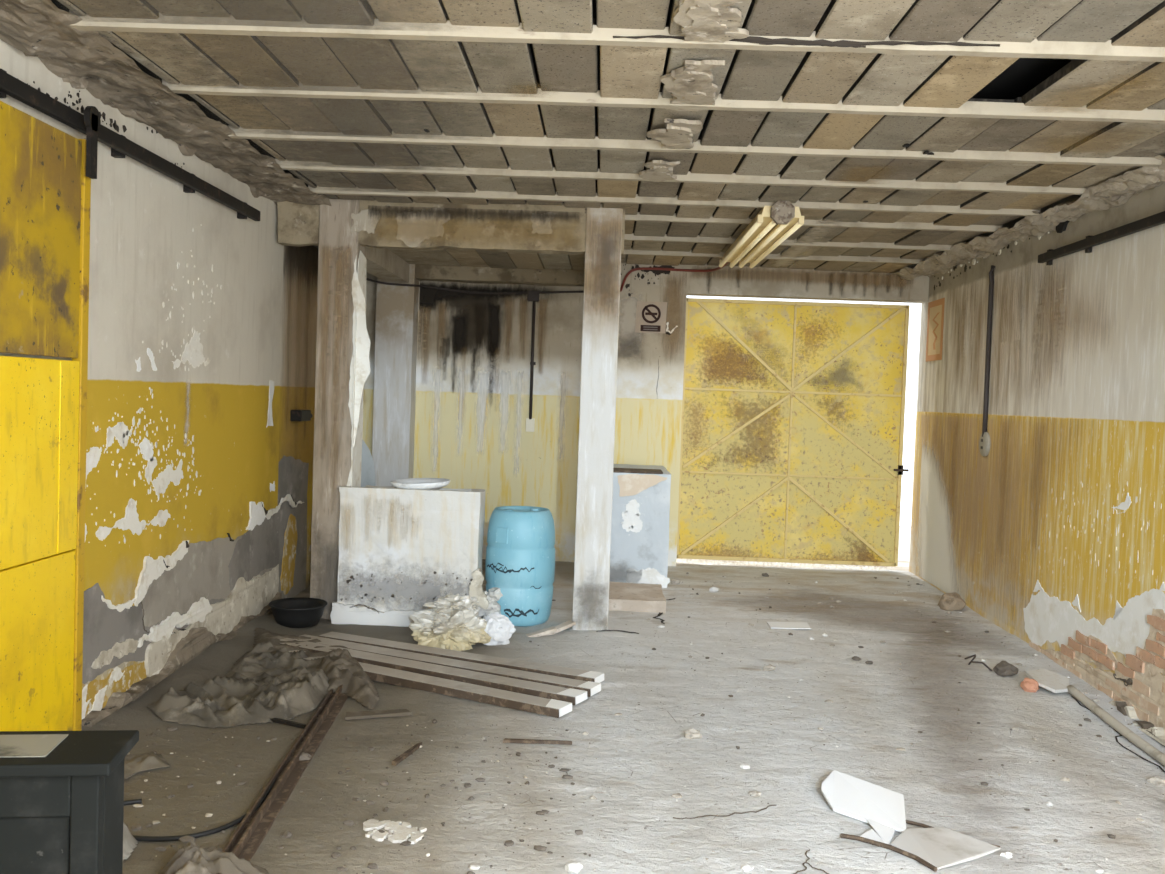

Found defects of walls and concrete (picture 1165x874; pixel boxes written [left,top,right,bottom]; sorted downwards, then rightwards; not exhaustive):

flaking render [17,74,127,132]
flaking render [175,144,196,168]
peeling [934,220,1070,290]
water stain [419,284,546,467]
flaking render [82,380,309,719]
peeling [1023,580,1165,747]
crack [1114,729,1165,772]
crack [673,805,776,819]
crack [793,850,829,874]